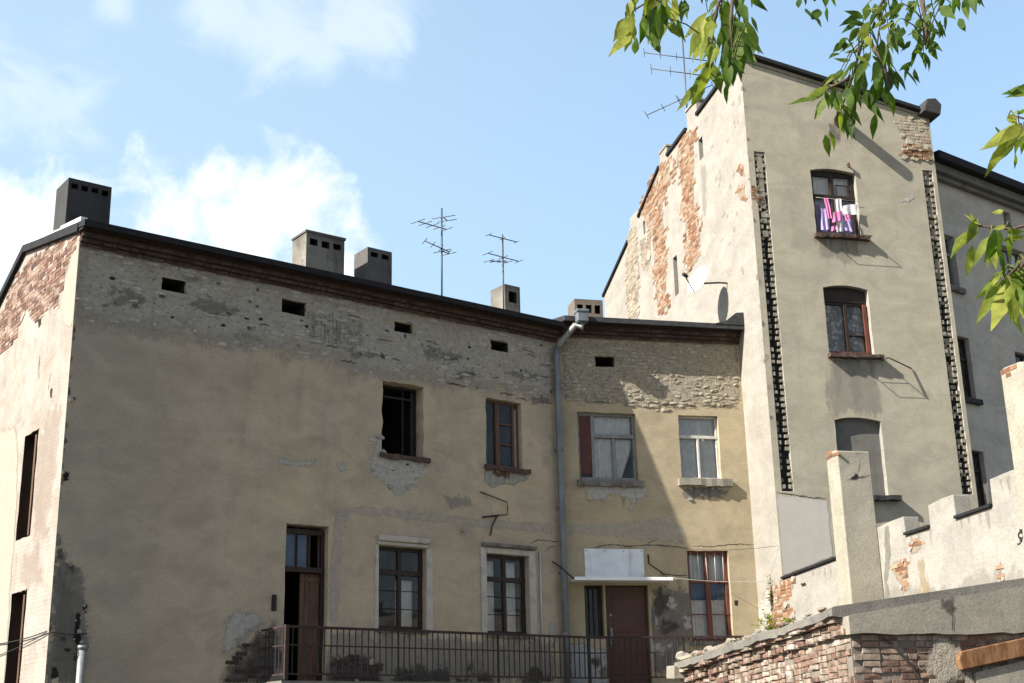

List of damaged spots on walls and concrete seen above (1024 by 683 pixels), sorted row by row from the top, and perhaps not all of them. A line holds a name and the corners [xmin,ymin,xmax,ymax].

flaking render [894,113,932,162]
flaking render [624,126,703,319]
flaking render [0,234,741,412]
flaking render [368,434,433,496]
flaking render [484,470,529,488]
peeling [583,486,649,511]
crack [593,540,751,549]
flaking render [890,538,925,593]
leakage [47,539,91,683]
leakage [651,574,692,676]
flaking render [758,575,806,629]